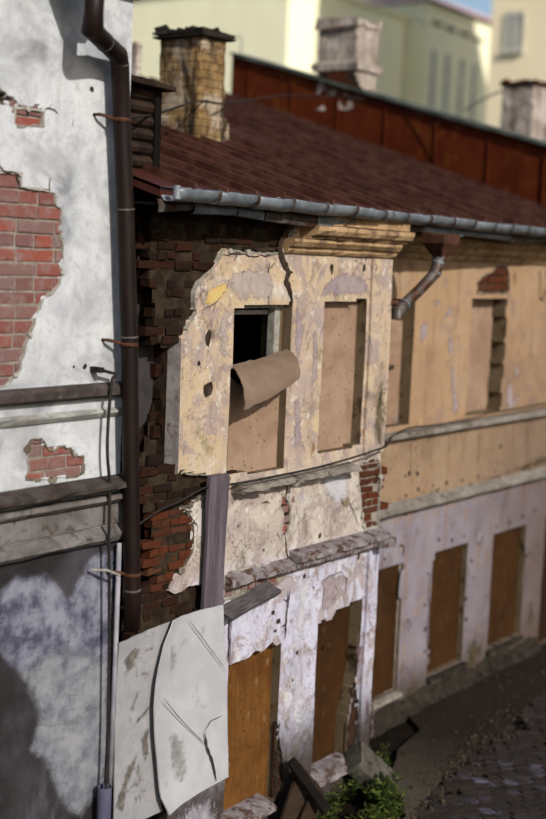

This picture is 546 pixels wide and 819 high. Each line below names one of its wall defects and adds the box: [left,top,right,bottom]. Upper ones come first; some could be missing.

spalling [0,88,45,129]
crack [203,225,295,313]
spalling [476,265,510,296]
peeling [0,171,296,819]
spalling [280,494,306,538]
peeling [324,474,349,507]
spalling [357,455,389,531]
peeling [313,576,344,610]
crack [166,701,221,781]